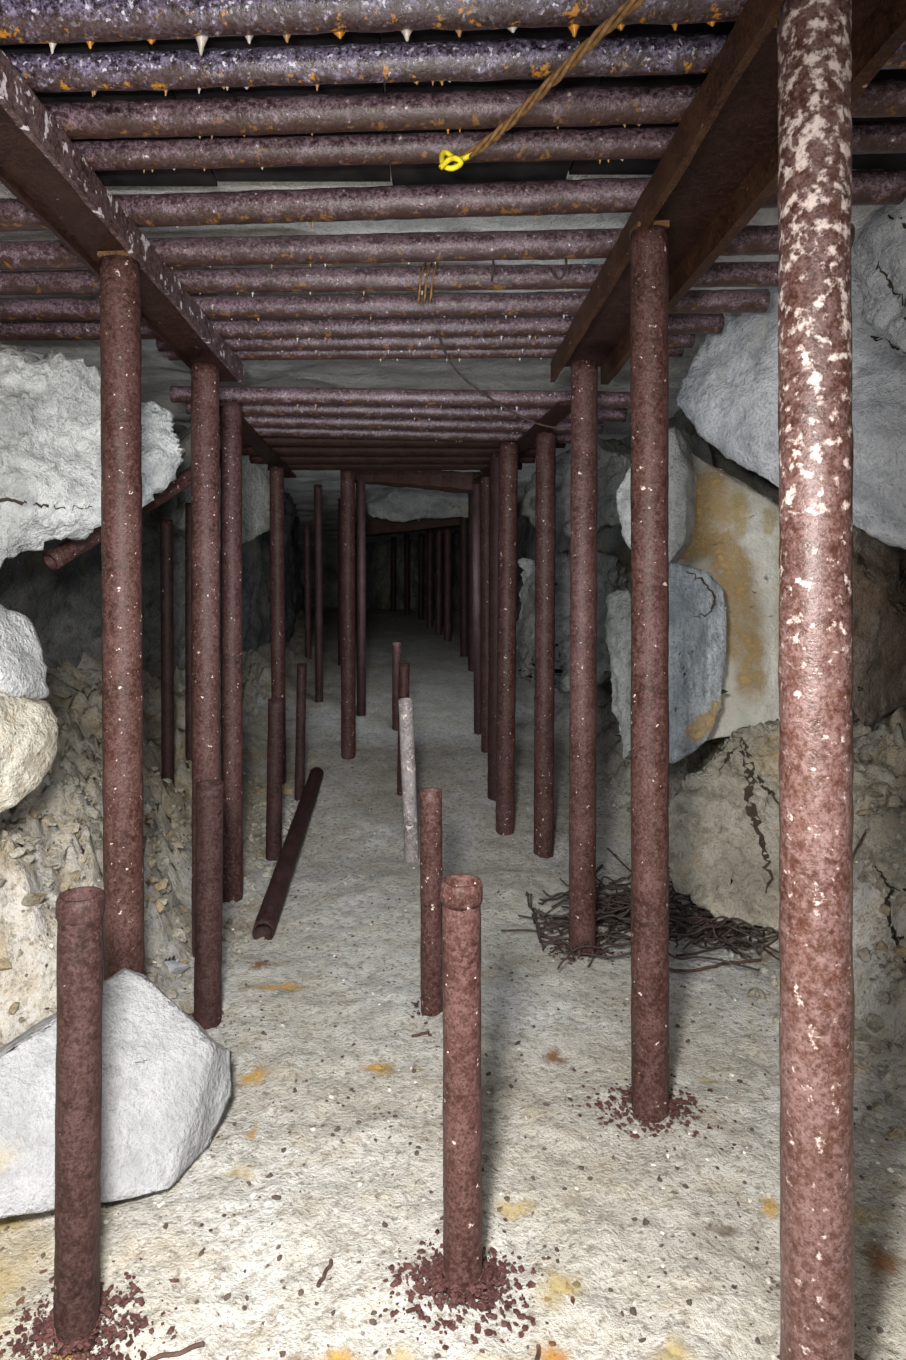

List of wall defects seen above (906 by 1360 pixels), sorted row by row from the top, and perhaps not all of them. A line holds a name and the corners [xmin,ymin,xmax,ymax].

rust [564,1071,725,1154]
rust [0,1258,179,1360]
rust [373,1229,575,1350]
rust [544,1341,564,1360]